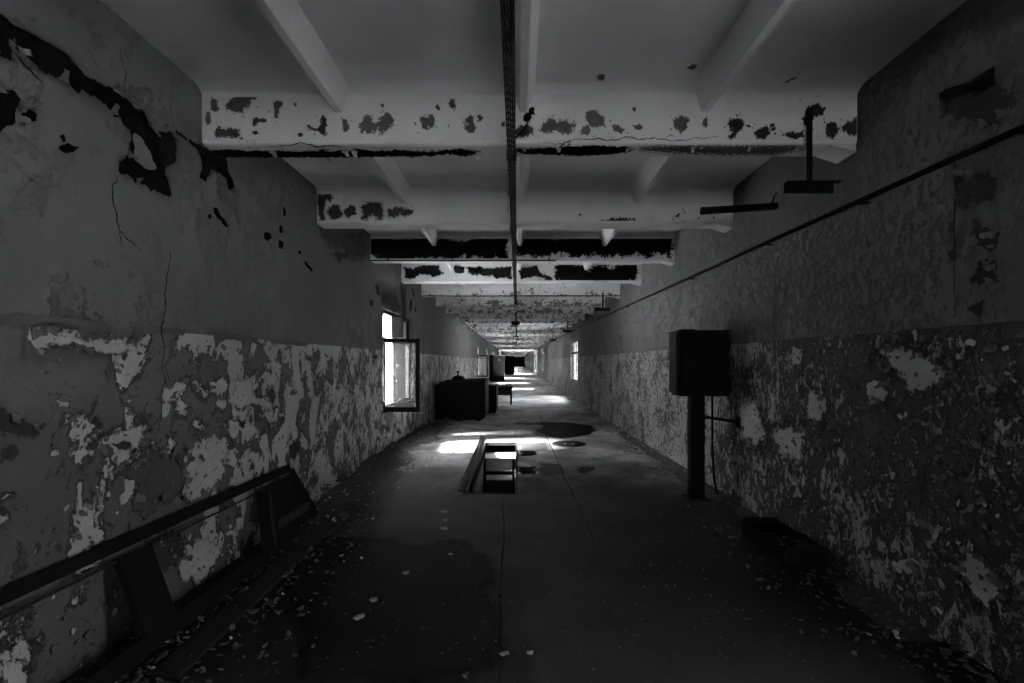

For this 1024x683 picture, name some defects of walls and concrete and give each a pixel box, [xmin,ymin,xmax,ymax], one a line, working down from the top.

peeling [28,325,187,375]
peeling [0,333,416,554]
peeling [129,513,256,590]